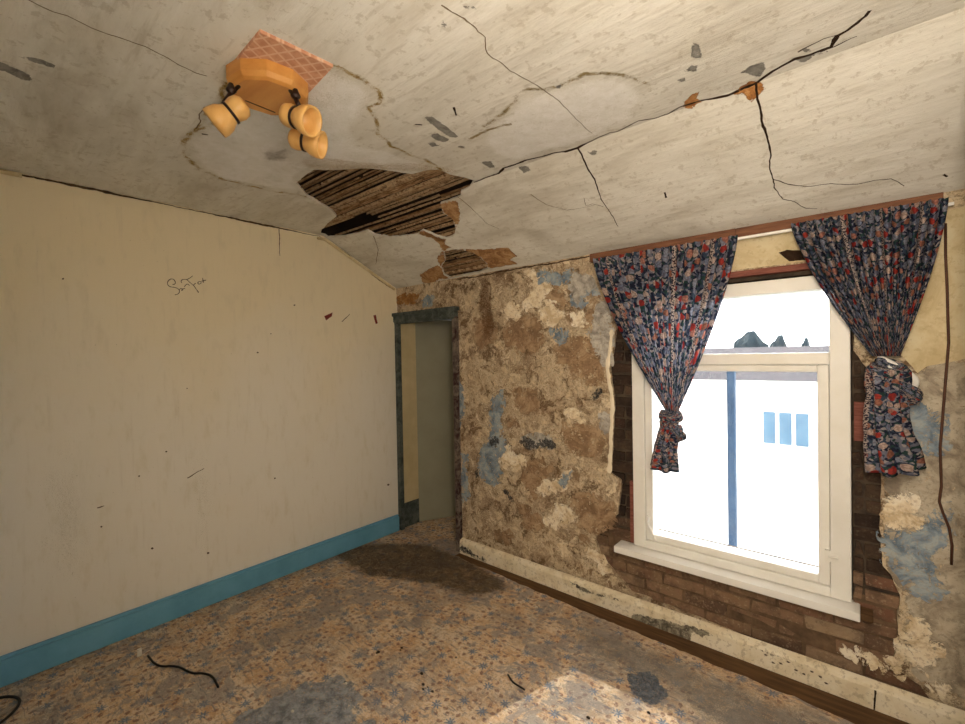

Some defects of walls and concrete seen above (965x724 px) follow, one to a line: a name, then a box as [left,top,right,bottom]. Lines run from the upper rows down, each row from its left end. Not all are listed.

crack [29,0,206,76]
water stain [180,65,451,197]
crack [441,5,904,227]
spalling [297,168,517,283]
flaking render [502,206,965,699]